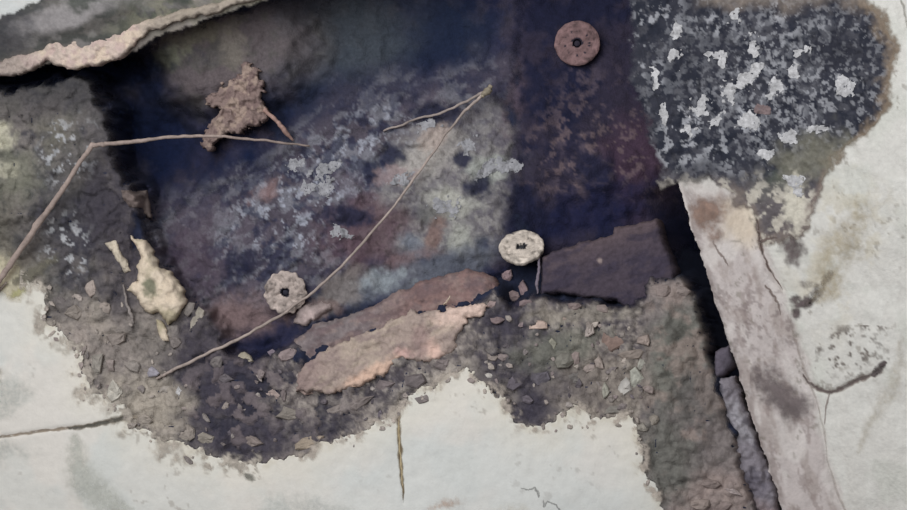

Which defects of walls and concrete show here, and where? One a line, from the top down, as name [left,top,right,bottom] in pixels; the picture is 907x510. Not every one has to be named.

flaking render [0,0,256,77]
peeling [200,61,271,152]
corrosion [511,0,699,264]
damp [629,0,899,264]
peeling [121,190,152,218]
damp [0,0,524,357]
crack [756,219,782,311]
damp [790,273,835,318]
crack [0,415,136,438]
flaking render [20,236,757,510]
crack [803,361,887,424]